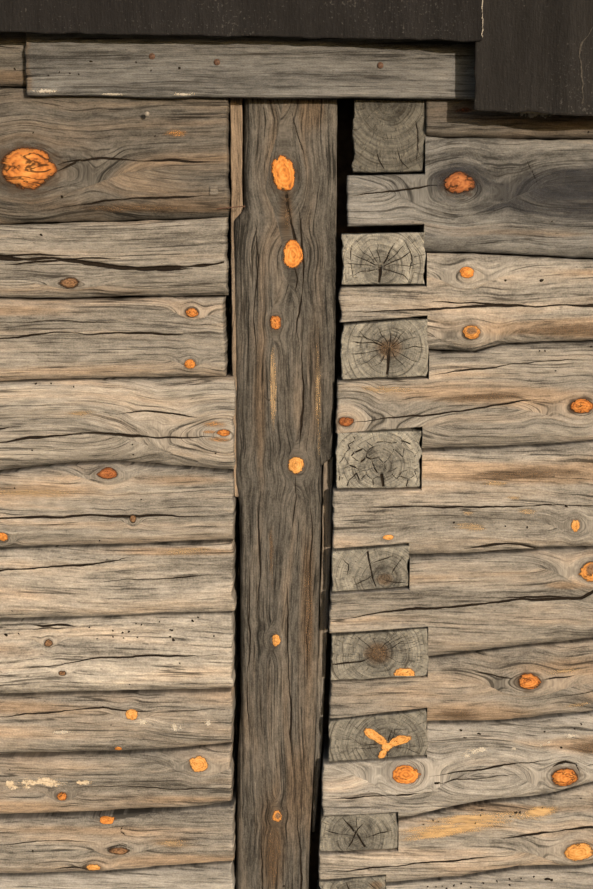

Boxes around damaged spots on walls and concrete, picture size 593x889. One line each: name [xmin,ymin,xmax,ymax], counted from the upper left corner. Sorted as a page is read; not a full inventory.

crack [58,157,220,171]
crack [69,195,210,207]
crack [0,253,224,271]
crack [350,244,418,283]
crack [339,399,593,509]
crack [464,543,540,552]
crack [345,551,405,587]
crack [286,478,313,761]
crack [332,590,593,670]
crack [542,676,593,700]
crack [339,728,419,758]
crack [297,758,593,889]